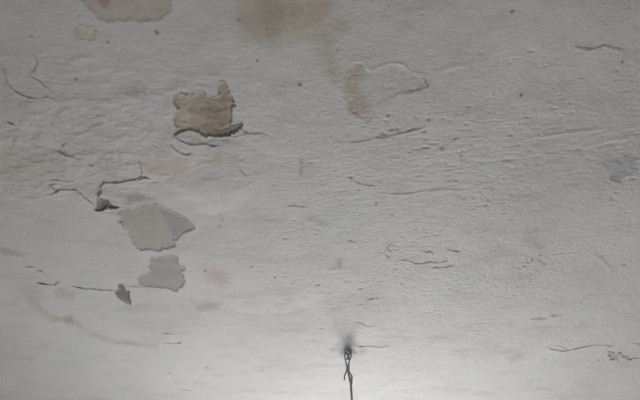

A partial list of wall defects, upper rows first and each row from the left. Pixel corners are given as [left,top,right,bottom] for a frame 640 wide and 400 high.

peeling [80,0,172,23]
damp [222,0,360,94]
spalling [172,80,243,145]
peeling [339,60,430,126]
crack [52,168,152,205]
peeling [94,189,195,292]
spalling [115,284,131,304]